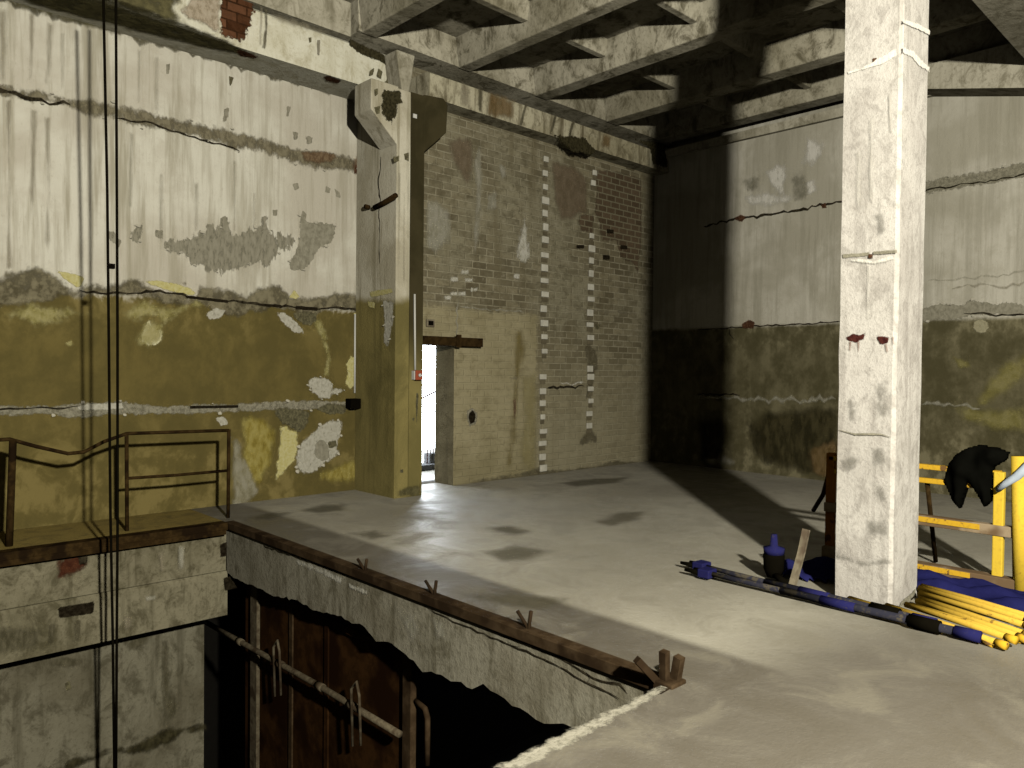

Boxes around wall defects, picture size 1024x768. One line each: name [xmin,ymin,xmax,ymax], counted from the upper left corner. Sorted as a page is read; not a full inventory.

flaking render [182,0,255,42]
spalling [349,39,403,121]
crack [375,159,383,264]
crack [704,201,842,227]
flaking render [109,210,336,277]
peeling [11,304,72,323]
rust [847,334,894,352]
crack [547,381,583,389]
flaking render [0,311,355,504]
crack [265,546,347,575]
crack [429,608,627,699]